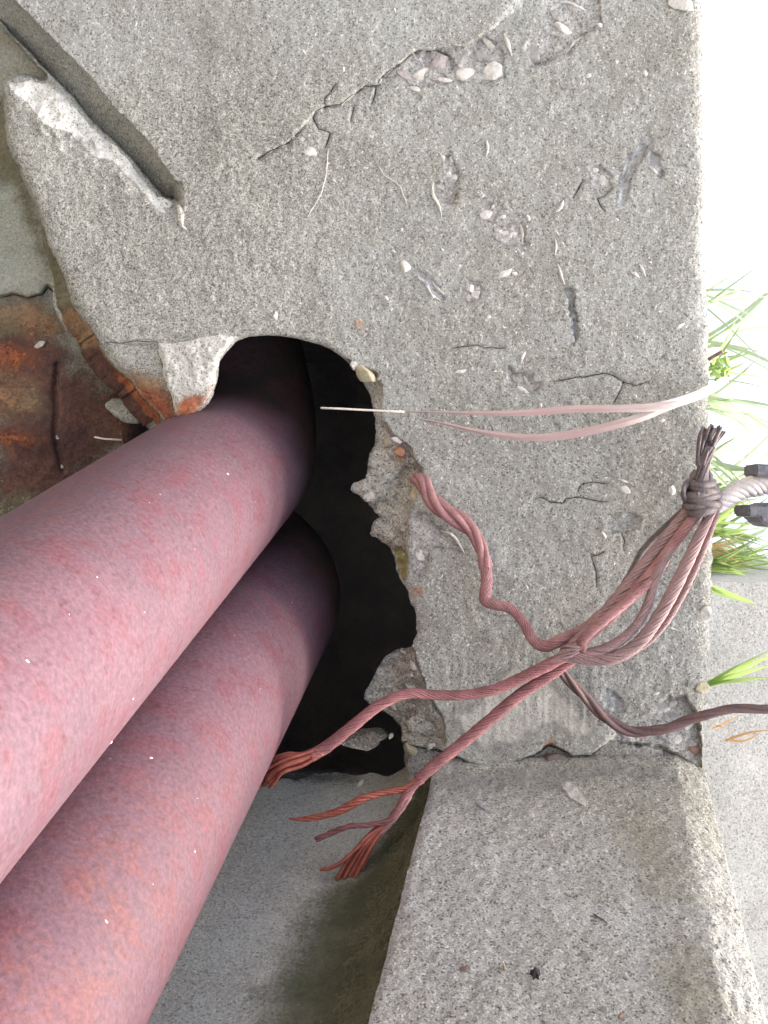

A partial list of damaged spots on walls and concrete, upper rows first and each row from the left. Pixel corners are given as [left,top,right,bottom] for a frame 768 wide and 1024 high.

crack [259,50,441,216]
rust [0,294,206,512]
peeling [158,334,235,416]
crack [553,373,646,401]
spalling [349,361,465,582]
crack [535,482,605,504]
spalling [366,648,448,764]
crack [399,738,467,762]
crack [523,744,606,759]
leakage [262,776,432,1024]